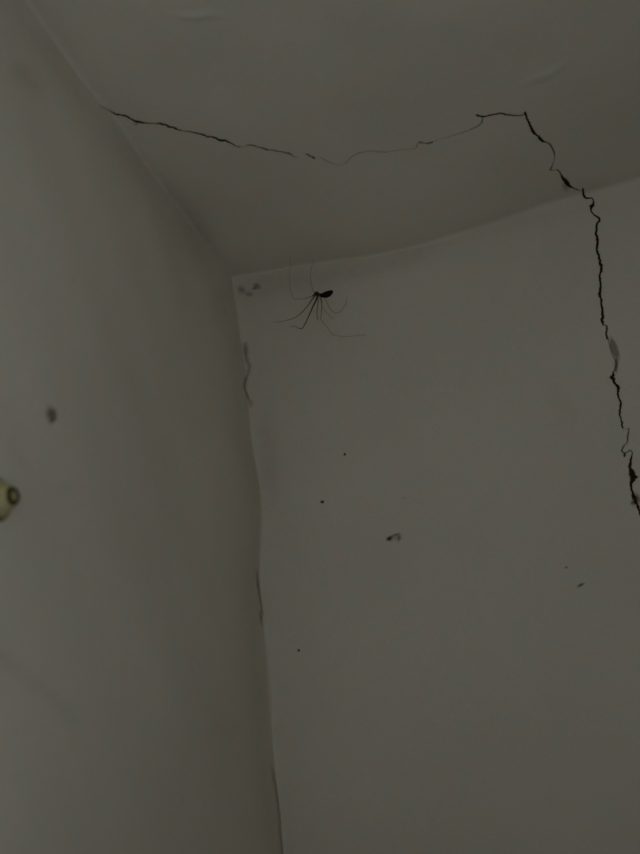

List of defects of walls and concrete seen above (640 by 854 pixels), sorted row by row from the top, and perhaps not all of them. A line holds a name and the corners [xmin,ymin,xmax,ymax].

crack [111,112,315,159]
crack [476,112,608,339]
crack [610,366,640,515]